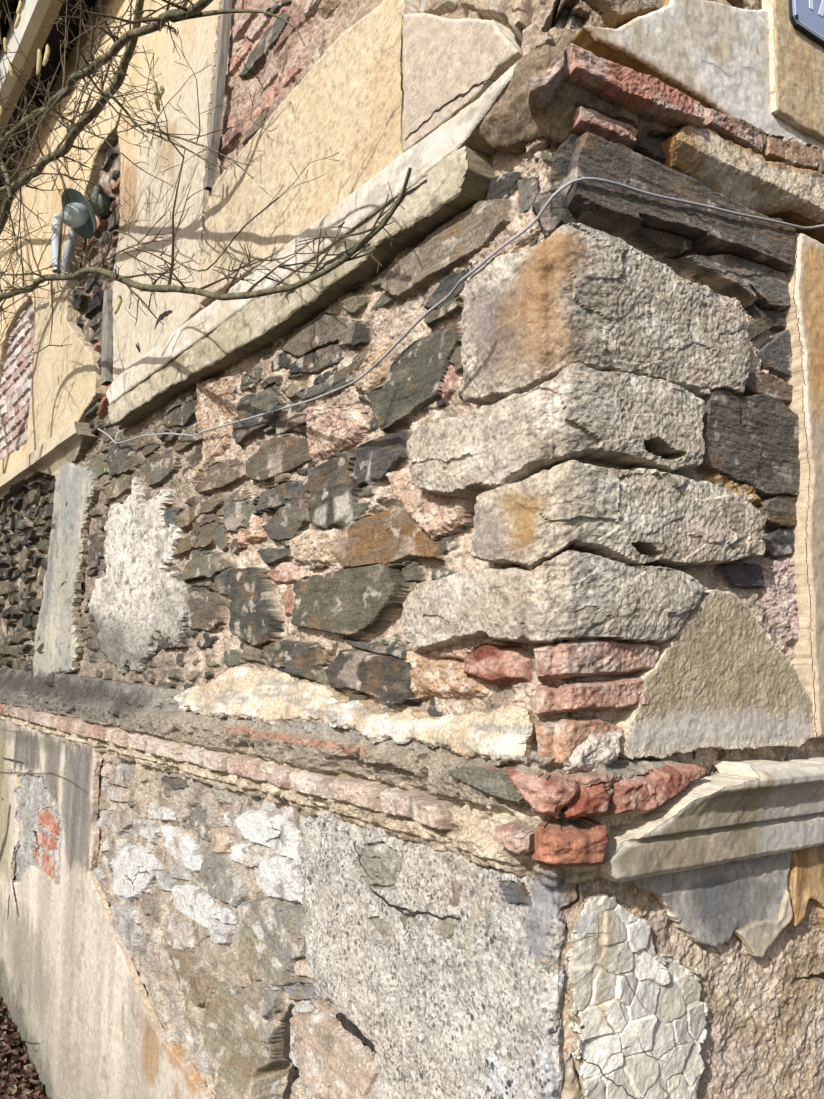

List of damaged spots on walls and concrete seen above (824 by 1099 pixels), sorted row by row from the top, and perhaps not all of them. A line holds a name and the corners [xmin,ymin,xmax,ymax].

spalling [2,760,68,884]
leakage [5,729,91,869]
spalling [89,752,366,1099]
spalling [371,909,417,960]
spalling [431,916,468,951]
spalling [449,881,487,925]
crack [567,915,695,1099]
spalling [537,845,824,1099]